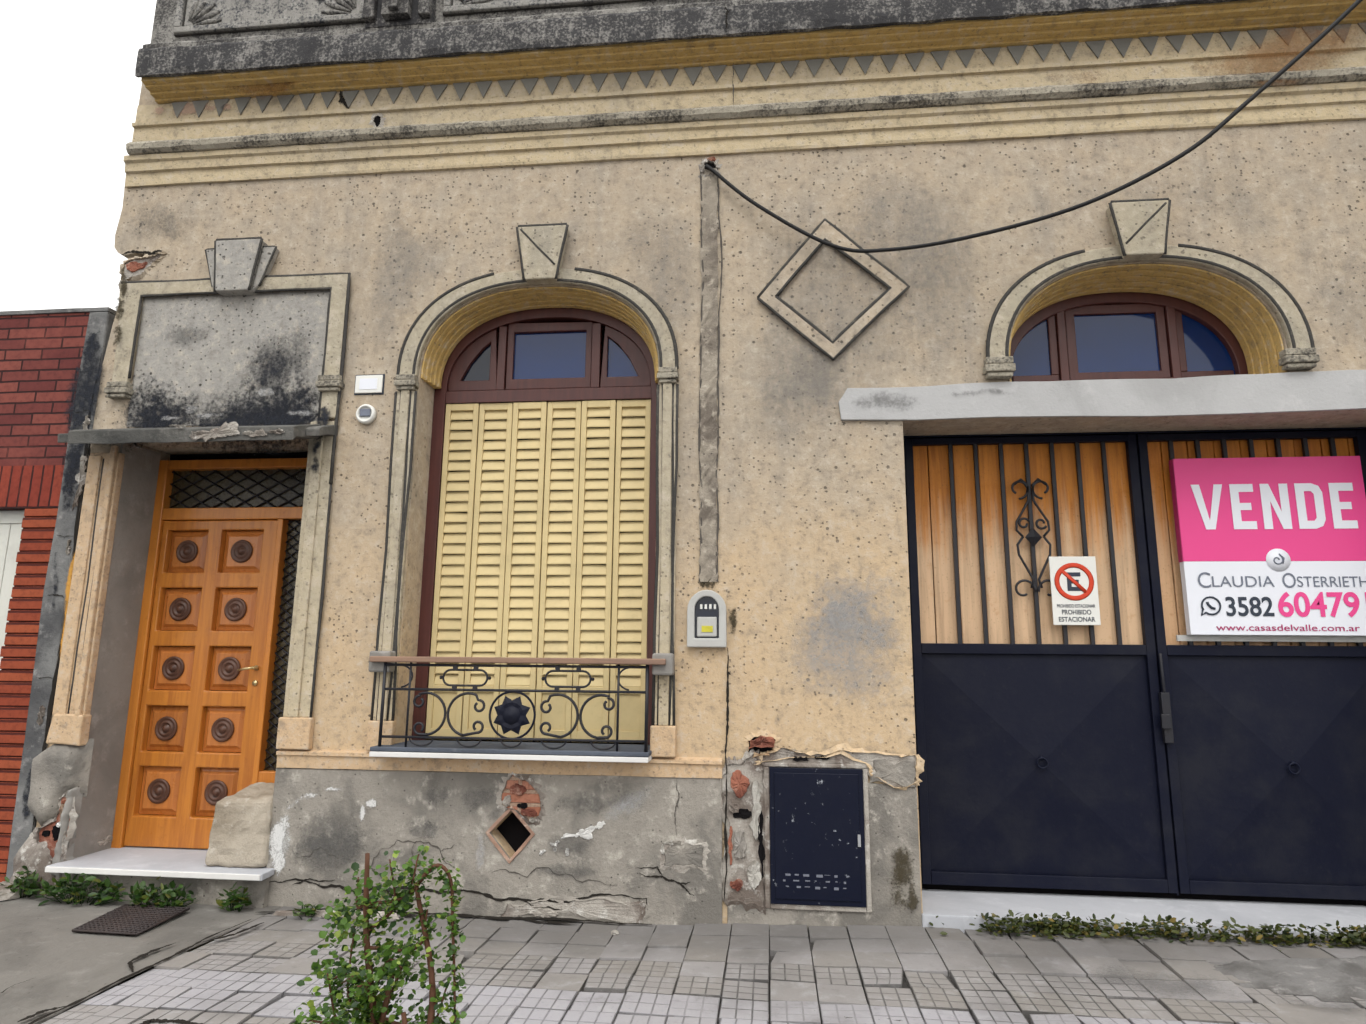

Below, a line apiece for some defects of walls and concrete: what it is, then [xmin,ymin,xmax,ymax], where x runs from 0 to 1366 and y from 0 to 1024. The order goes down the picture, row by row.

spalling [118,251,167,289]
damp [126,349,330,472]
spalling [33,790,78,863]
crack [269,648,731,911]
spalling [496,772,547,826]
peeling [539,821,605,856]
spalling [659,730,925,915]